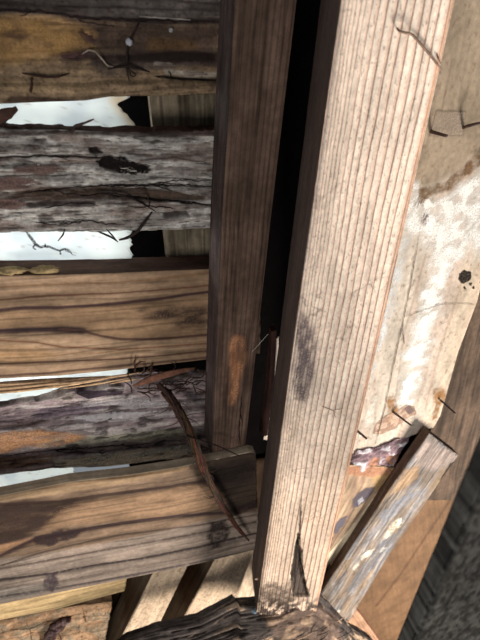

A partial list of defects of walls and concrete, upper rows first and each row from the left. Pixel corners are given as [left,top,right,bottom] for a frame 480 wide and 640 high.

crack [155,71,210,81]
crack [14,179,210,256]
damp [295,320,315,400]
crack [291,496,307,595]